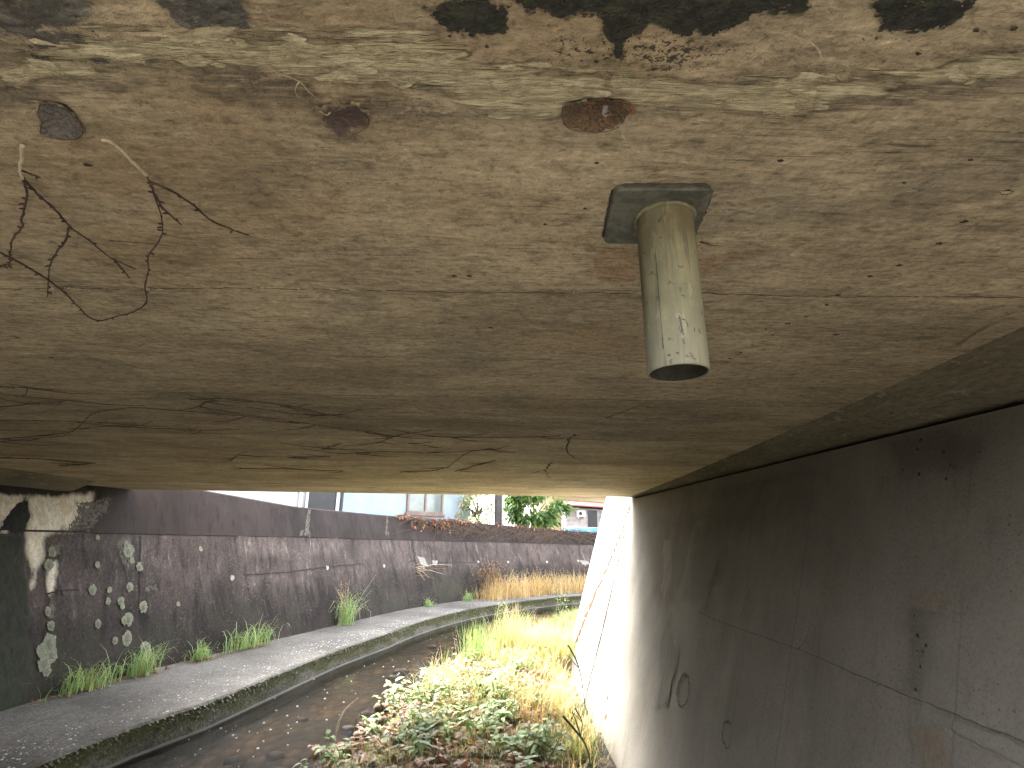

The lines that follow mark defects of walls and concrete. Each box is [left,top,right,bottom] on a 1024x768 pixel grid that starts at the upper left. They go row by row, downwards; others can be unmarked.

water stain [0,0,485,128]
peeling [0,22,1024,142]
mould [419,0,812,82]
mould [859,0,979,54]
crack [506,434,598,478]
water stain [0,489,114,711]
crack [699,612,1024,743]